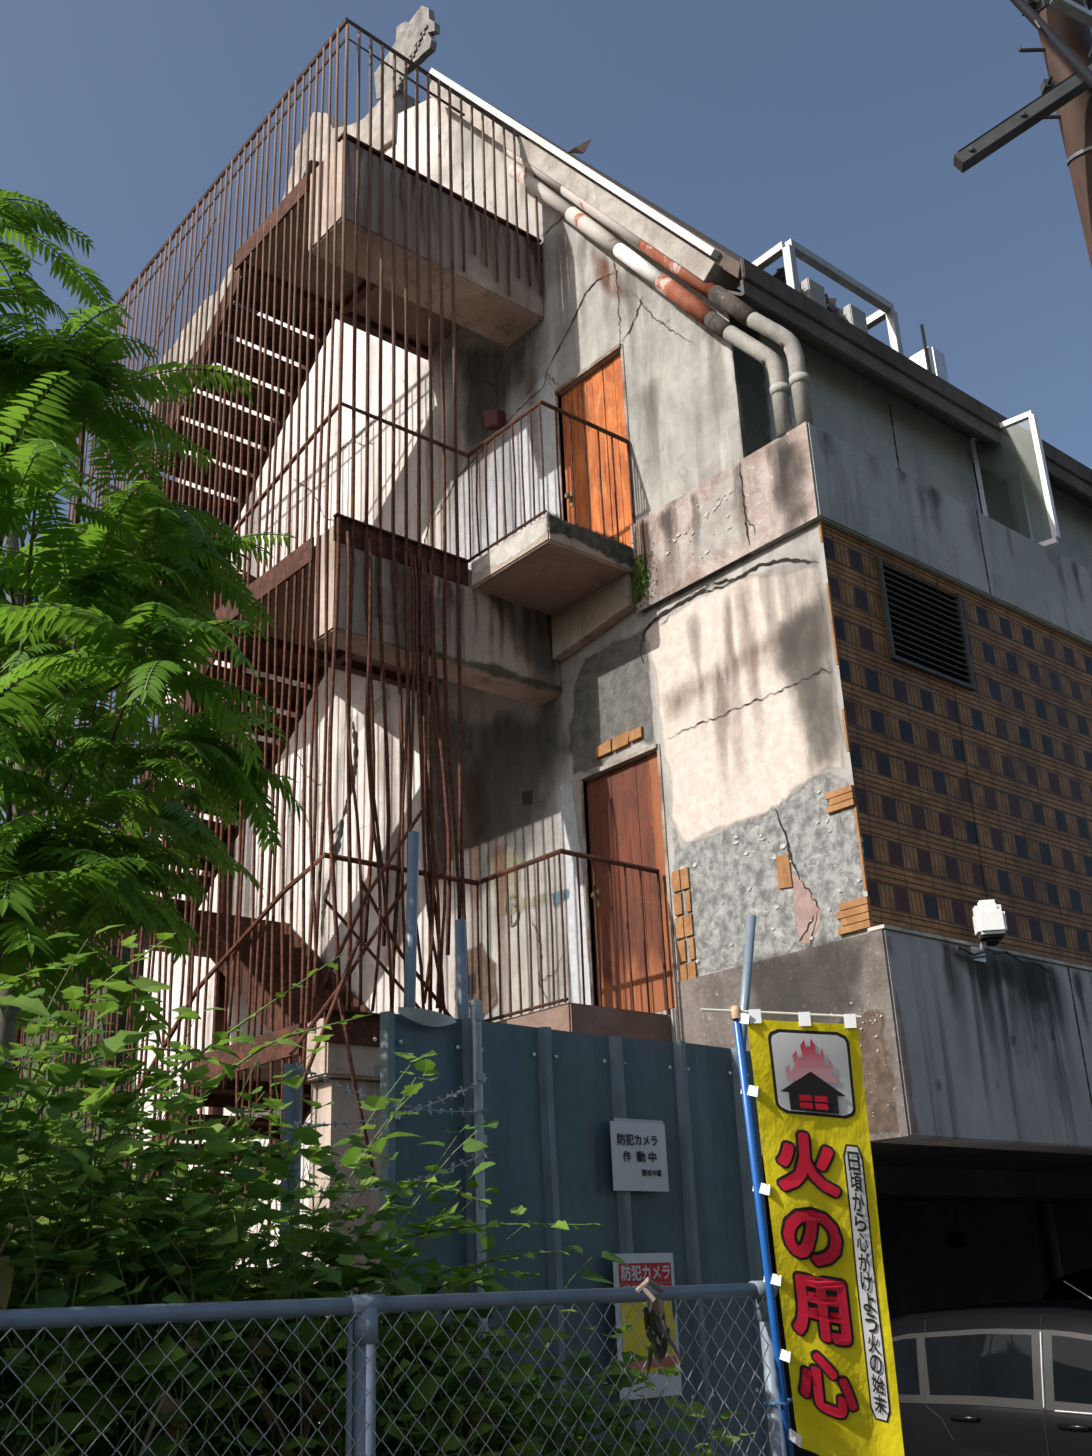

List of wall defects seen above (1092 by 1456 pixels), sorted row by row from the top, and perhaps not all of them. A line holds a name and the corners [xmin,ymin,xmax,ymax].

corrosion [597,258,621,291]
crack [640,463,818,664]
crack [667,668,832,739]
peeling [560,567,864,1005]
crack [775,809,819,949]
leakage [945,946,1059,1033]
leakage [1075,974,1084,1007]